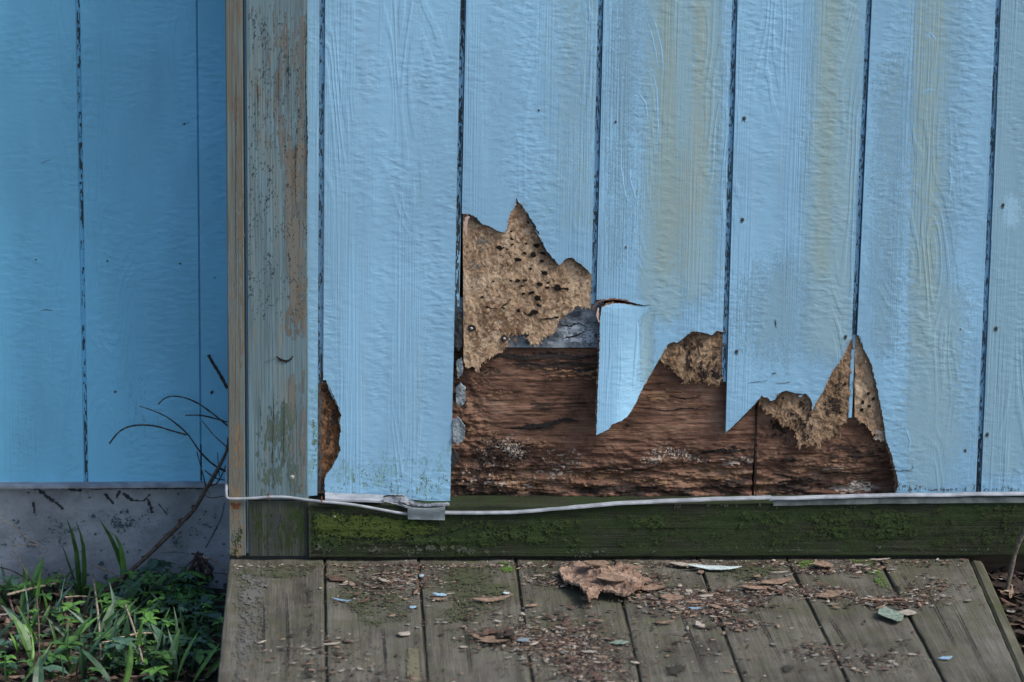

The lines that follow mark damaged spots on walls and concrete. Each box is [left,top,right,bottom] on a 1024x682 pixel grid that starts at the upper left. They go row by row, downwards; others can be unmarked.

peeling [228,0,308,426]
spalling [463,198,586,271]
peeling [451,314,466,468]
peeling [559,300,614,434]
spalling [724,335,897,492]
water stain [351,541,505,557]